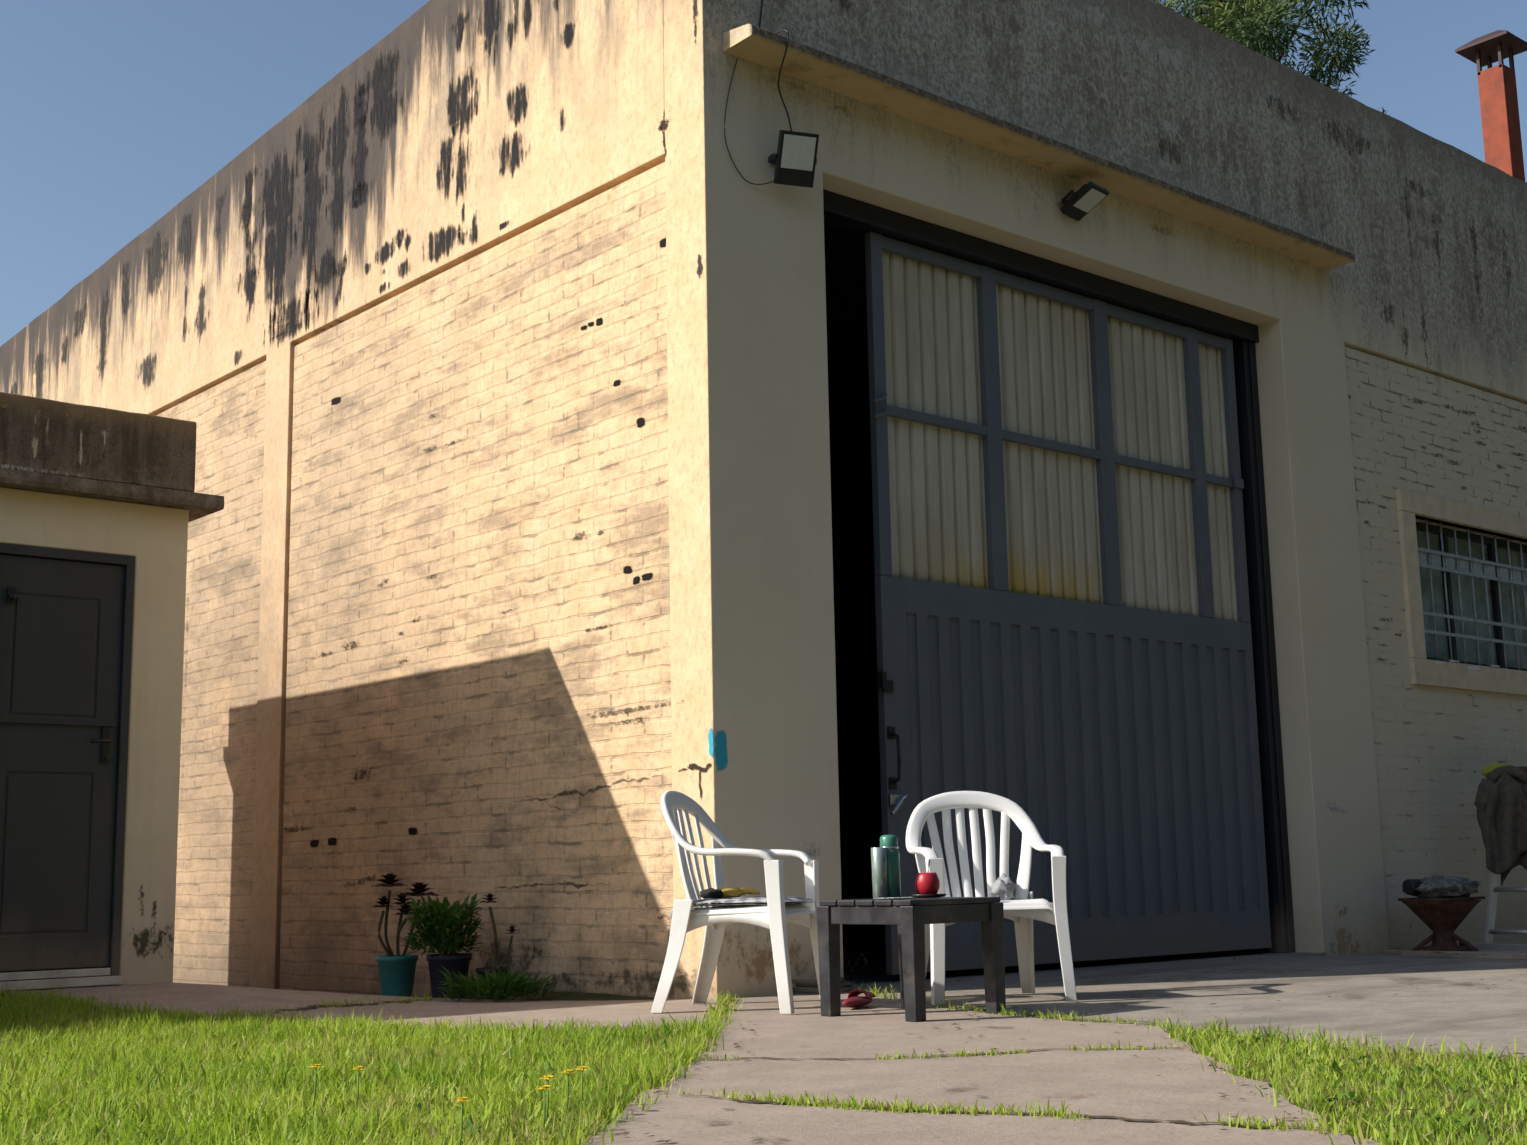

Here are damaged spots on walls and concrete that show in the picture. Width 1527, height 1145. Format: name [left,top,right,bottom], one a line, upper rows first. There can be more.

damp [452,0,532,68]
damp [555,0,574,49]
damp [215,52,404,344]
damp [422,64,478,262]
damp [499,83,530,177]
damp [146,212,209,343]
damp [11,265,131,398]
damp [136,354,156,392]
damp [1375,292,1428,368]